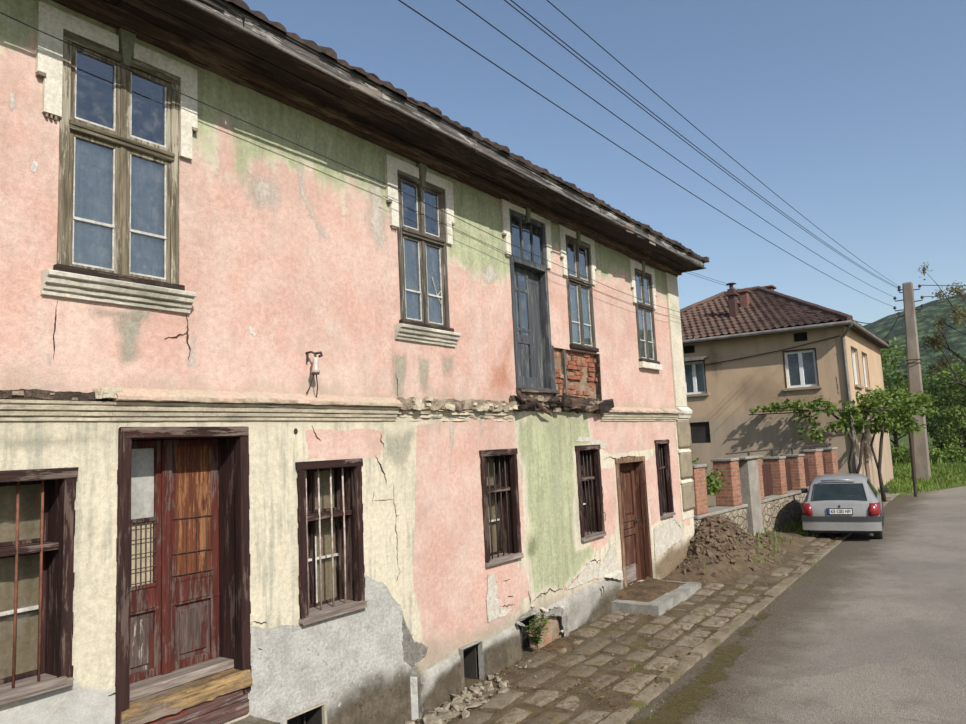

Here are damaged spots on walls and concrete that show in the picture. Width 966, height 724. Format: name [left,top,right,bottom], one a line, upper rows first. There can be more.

crack [165,315,191,360]
flaking render [552,346,602,401]
crack [372,435,400,582]
flaking render [485,573,513,622]
crack [500,559,601,614]
peeling [247,576,428,724]